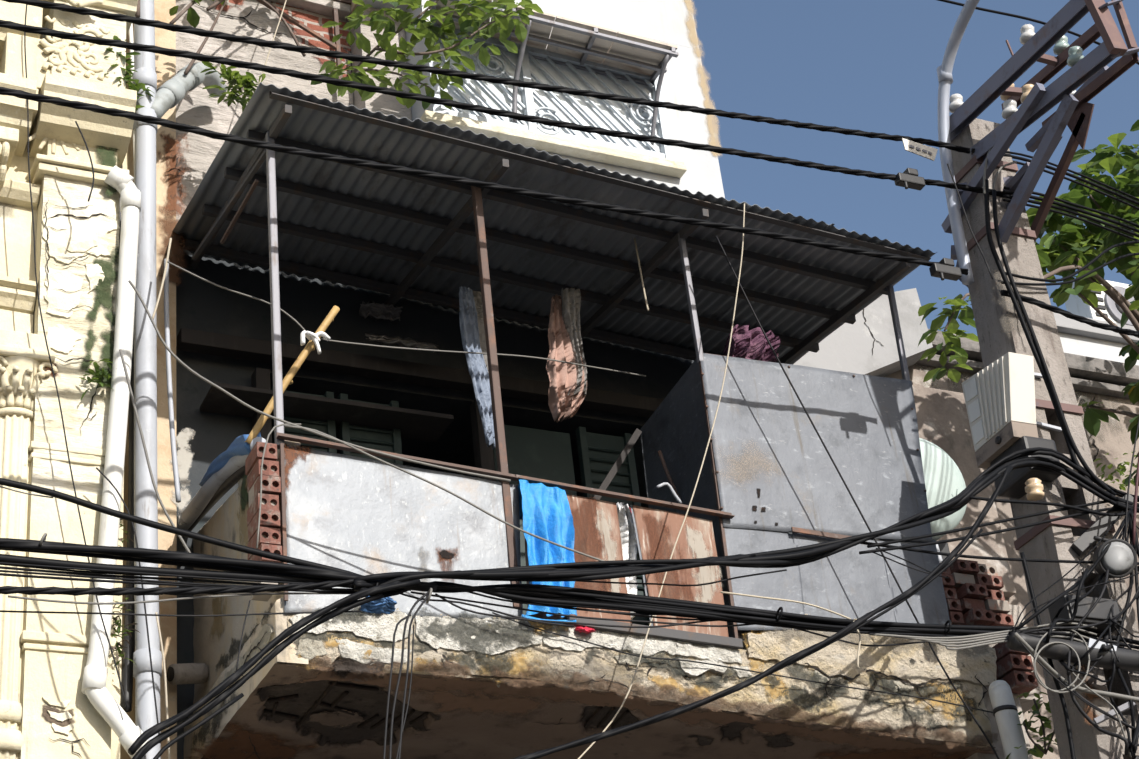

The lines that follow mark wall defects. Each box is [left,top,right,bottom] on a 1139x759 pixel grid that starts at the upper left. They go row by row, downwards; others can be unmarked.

flaking render [214,0,243,11]
flaking render [270,1,351,77]
flaking render [42,198,120,354]
rust [570,496,617,562]
rust [574,578,620,593]
rust [645,514,721,603]
flaking render [222,624,275,687]
flaking render [255,607,997,748]
spalling [42,697,75,735]